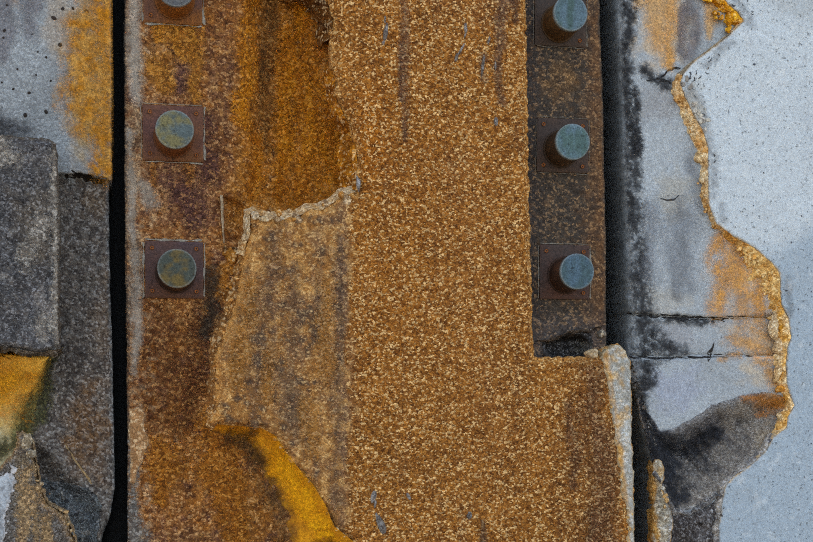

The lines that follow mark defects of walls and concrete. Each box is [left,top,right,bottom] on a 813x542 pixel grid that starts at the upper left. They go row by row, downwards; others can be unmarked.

corrosion [59,0,112,182]
corrosion [145,23,205,103]
corrosion [231,0,340,212]
water stain [0,356,57,458]
spalling [0,345,102,542]
corrosion [143,412,250,542]
spalling [204,0,361,542]
corrosion [268,441,337,542]
spalling [537,0,794,542]
water stain [620,0,724,540]
crack [627,312,767,322]
crack [629,343,770,361]